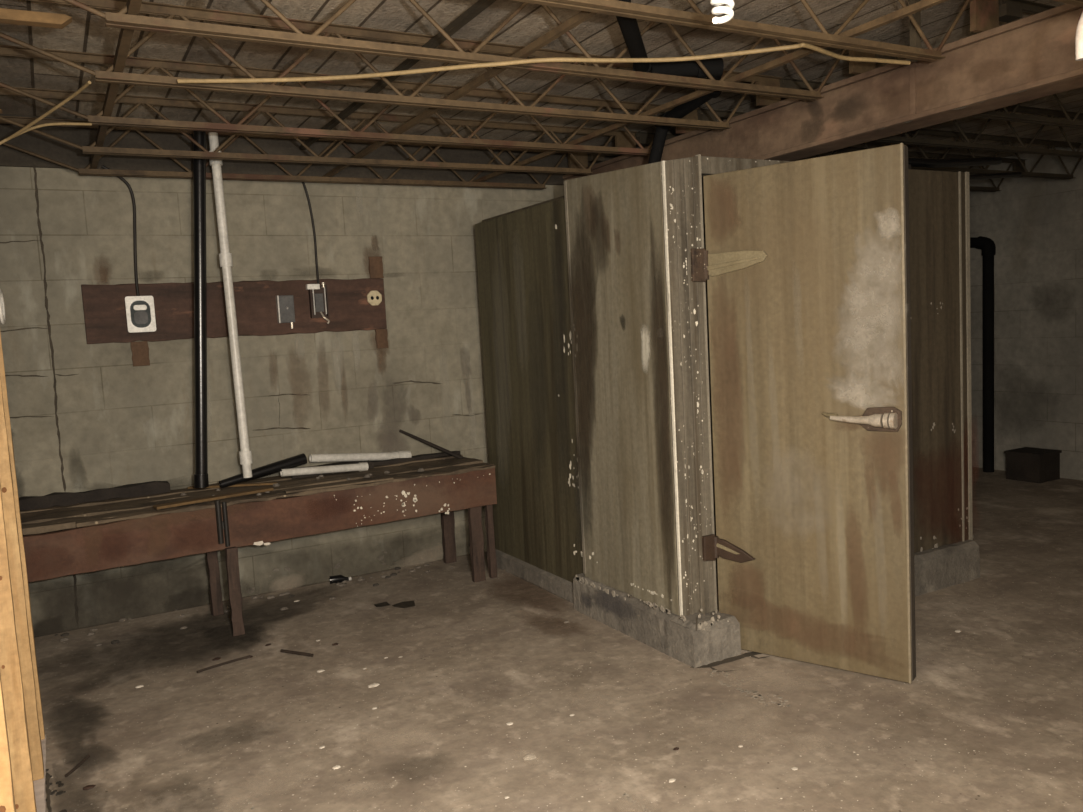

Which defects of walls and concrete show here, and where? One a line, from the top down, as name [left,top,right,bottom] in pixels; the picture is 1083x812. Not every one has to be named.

leakage [570,208,604,466]
leakage [652,255,673,545]